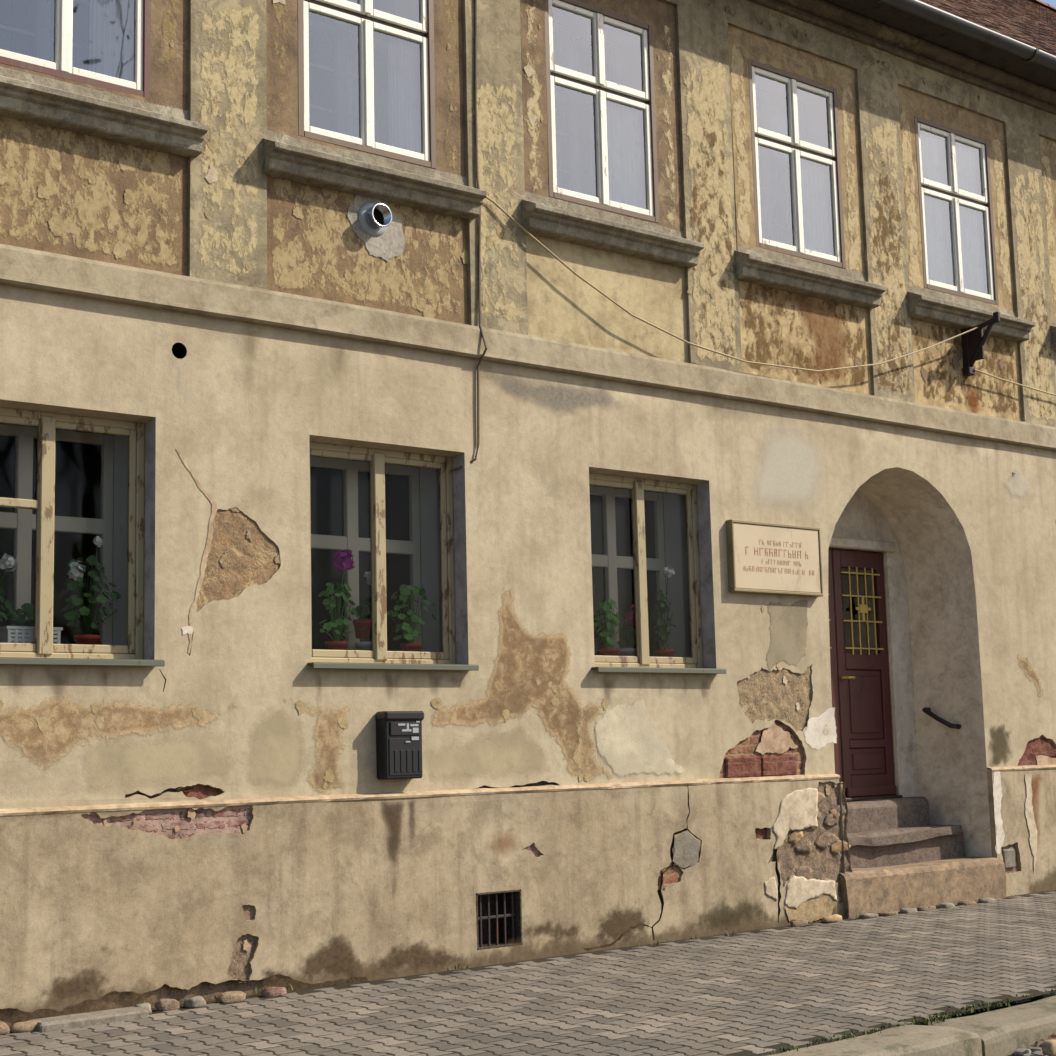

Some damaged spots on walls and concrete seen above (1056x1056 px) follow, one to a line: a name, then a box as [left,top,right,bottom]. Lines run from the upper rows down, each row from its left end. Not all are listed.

peeling [272,0,543,323]
peeling [658,25,1056,420]
flaking render [196,507,281,612]
flaking render [431,590,612,782]
flaking render [719,662,813,778]
flaking render [81,784,253,840]
crack [609,785,702,946]
flaking render [755,781,852,923]
damp [1025,773,1056,893]
damp [8,970,155,1023]
flaking render [101,934,291,1008]
damp [266,902,794,992]